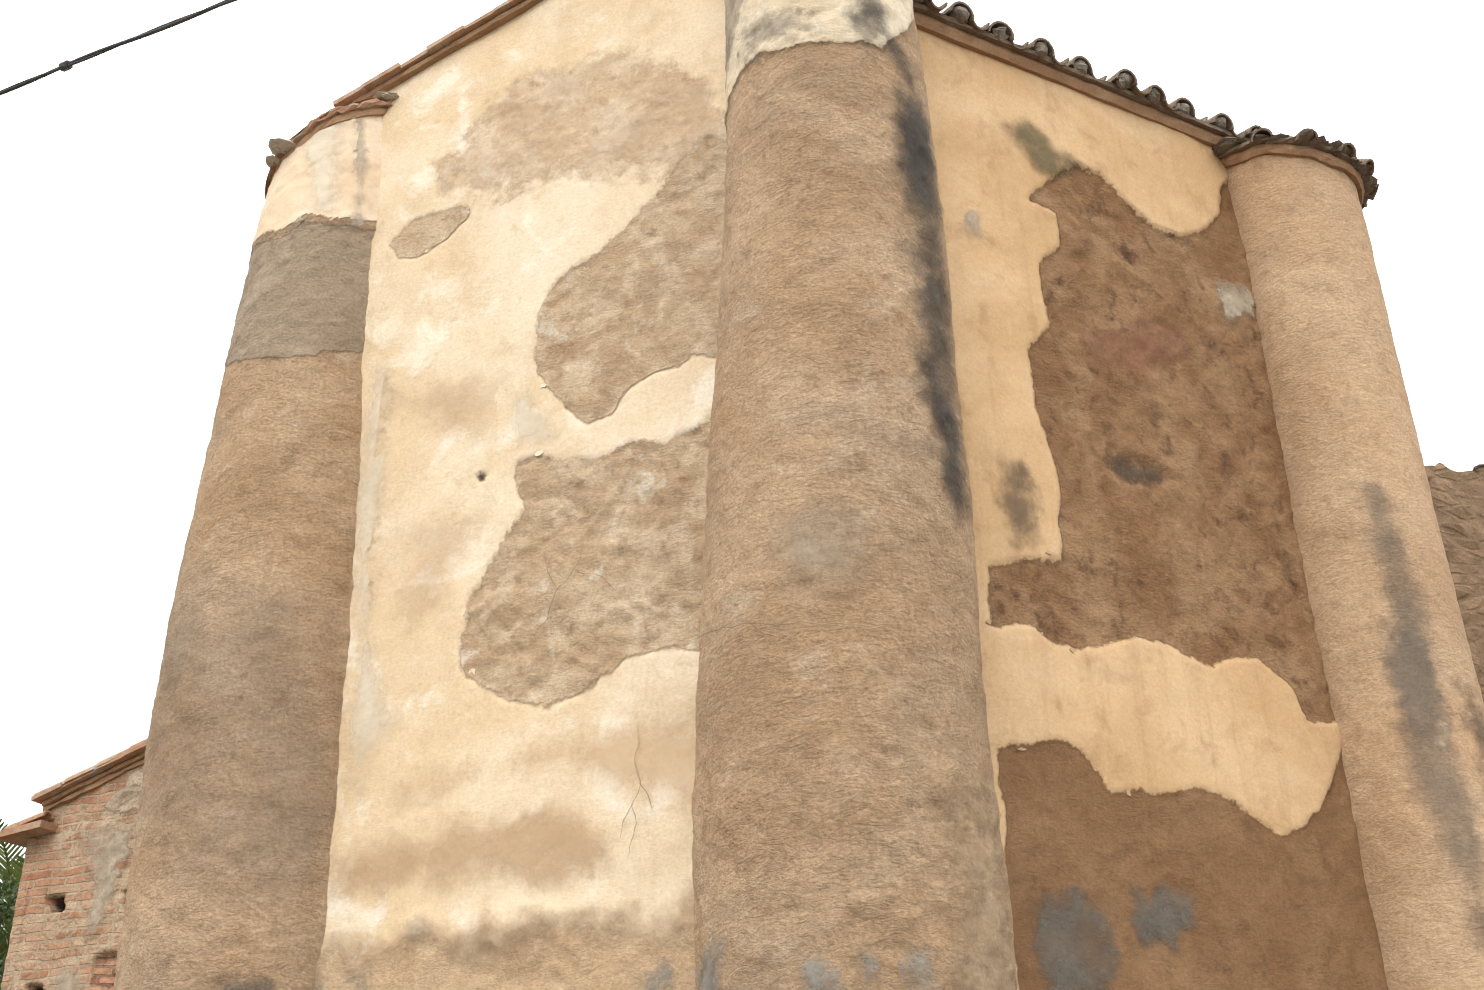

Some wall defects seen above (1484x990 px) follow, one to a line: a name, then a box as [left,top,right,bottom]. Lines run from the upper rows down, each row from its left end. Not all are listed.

flaking render [224,0,914,423]
leakage [888,40,969,506]
flaking render [357,466,380,553]
flaking render [459,422,711,708]
leakage [1006,464,1033,530]
flaking render [986,165,1335,723]
leakage [349,812,601,883]
crack [620,721,652,856]
flaking render [997,739,1388,990]